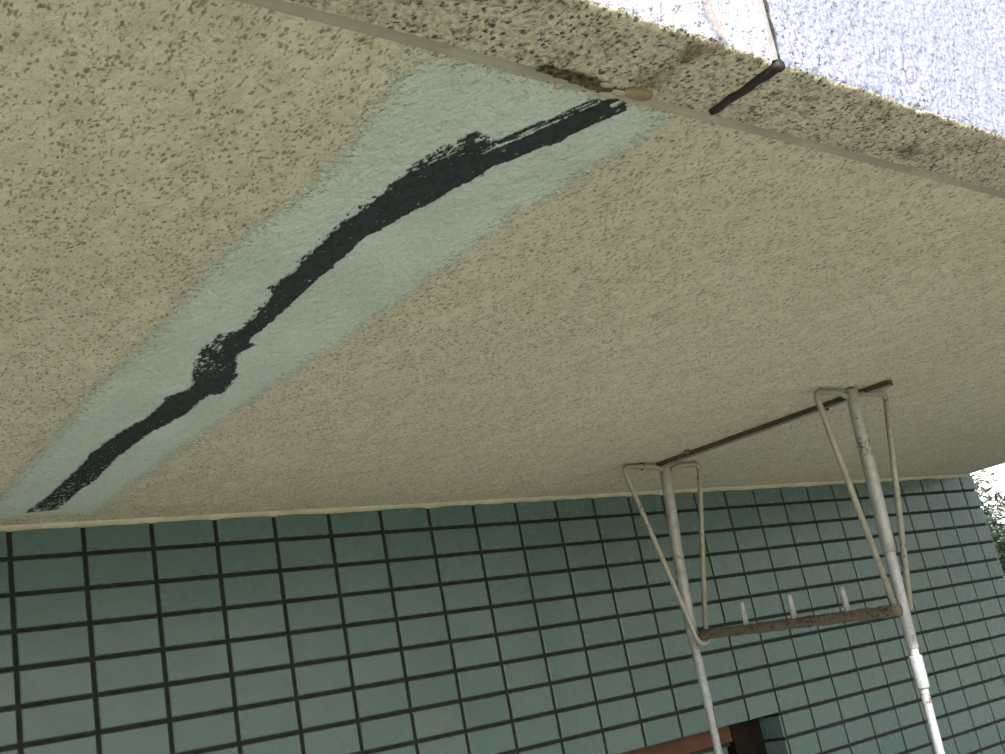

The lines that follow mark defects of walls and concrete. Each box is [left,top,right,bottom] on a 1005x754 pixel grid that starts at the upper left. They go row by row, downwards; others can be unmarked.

crack [26,99,628,513]